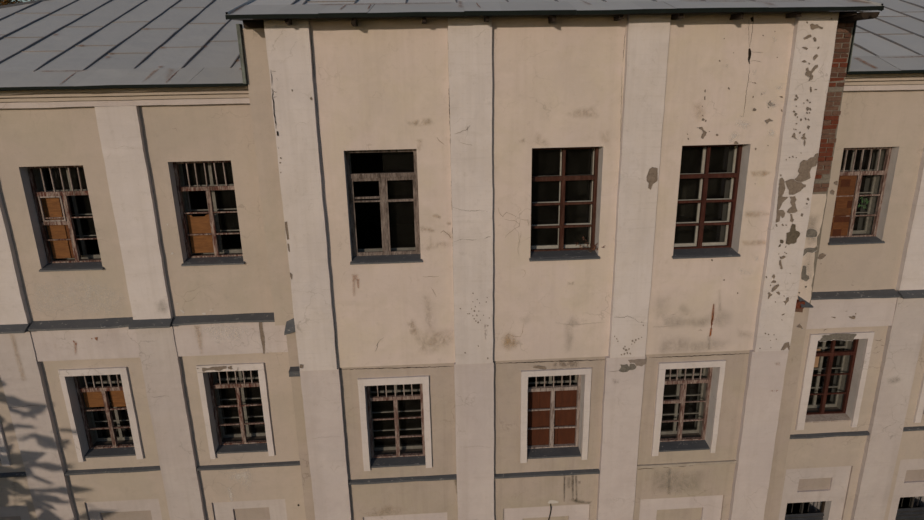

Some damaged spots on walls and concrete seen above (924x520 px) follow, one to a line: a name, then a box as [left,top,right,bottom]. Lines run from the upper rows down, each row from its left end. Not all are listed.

crack [743,17,763,115]
spalling [646,167,658,190]
flaking render [752,18,854,315]
spalling [610,336,646,373]